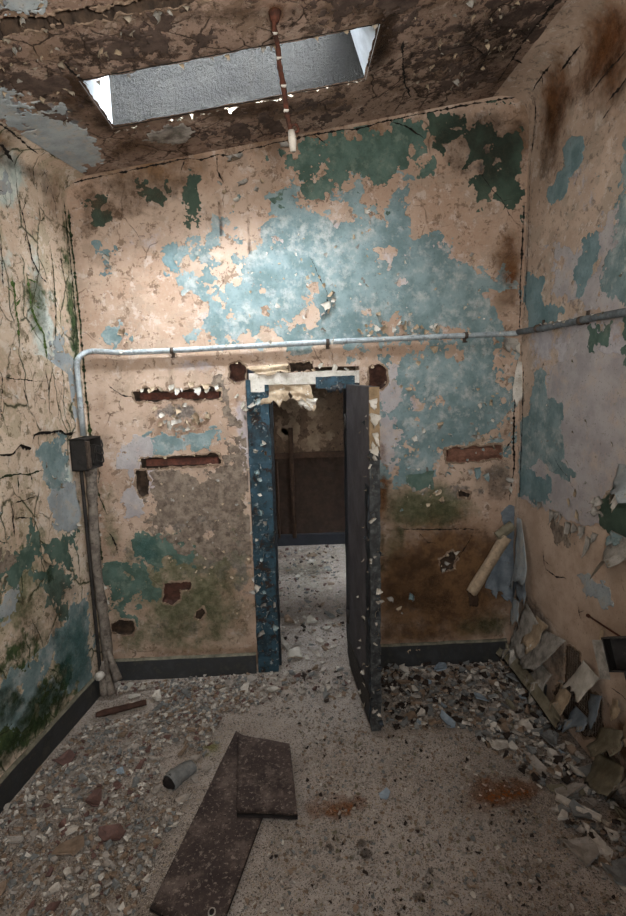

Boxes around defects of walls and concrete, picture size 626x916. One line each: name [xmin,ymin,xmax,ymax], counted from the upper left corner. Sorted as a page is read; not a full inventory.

peeling [303,0,566,93]
crack [589,52,626,118]
peeling [81,194,113,227]
crack [74,0,580,329]
peeling [91,240,118,277]
crack [0,124,92,543]
peeling [99,80,626,803]
crack [506,360,524,500]
crack [97,469,119,560]